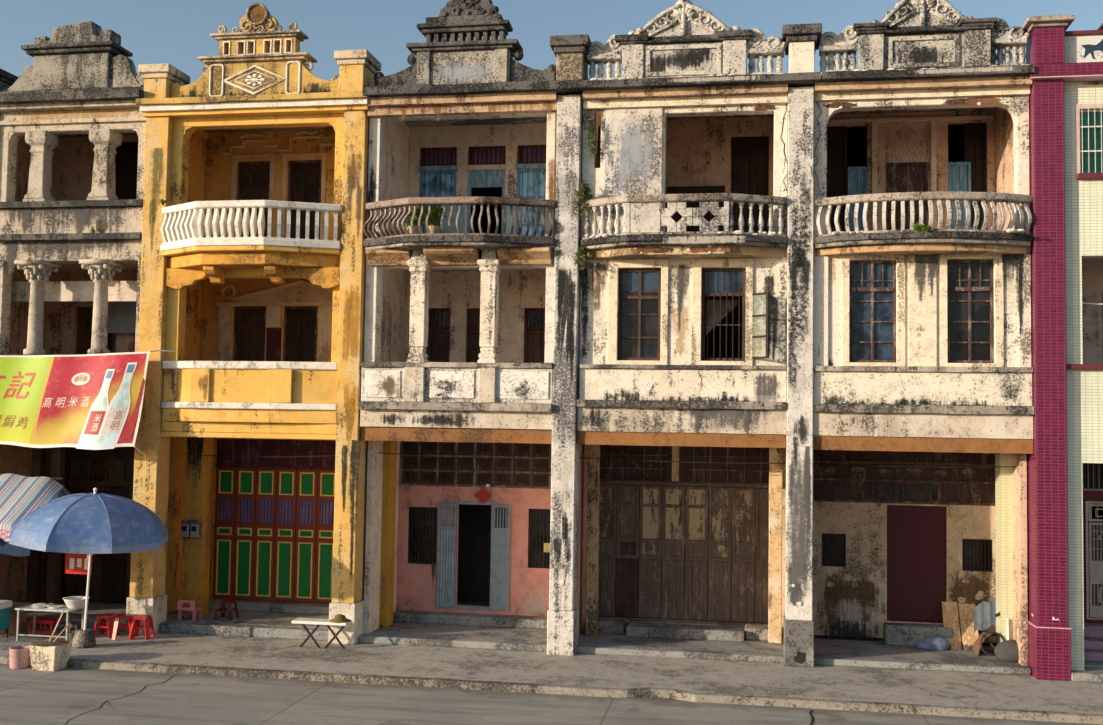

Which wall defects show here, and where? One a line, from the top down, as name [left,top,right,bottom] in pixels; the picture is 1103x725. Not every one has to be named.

water stain [555,263,607,380]
water stain [580,174,812,432]
water stain [379,375,474,427]
water stain [511,379,536,401]
water stain [341,440,359,578]
water stain [787,416,811,604]
water stain [821,579,879,641]